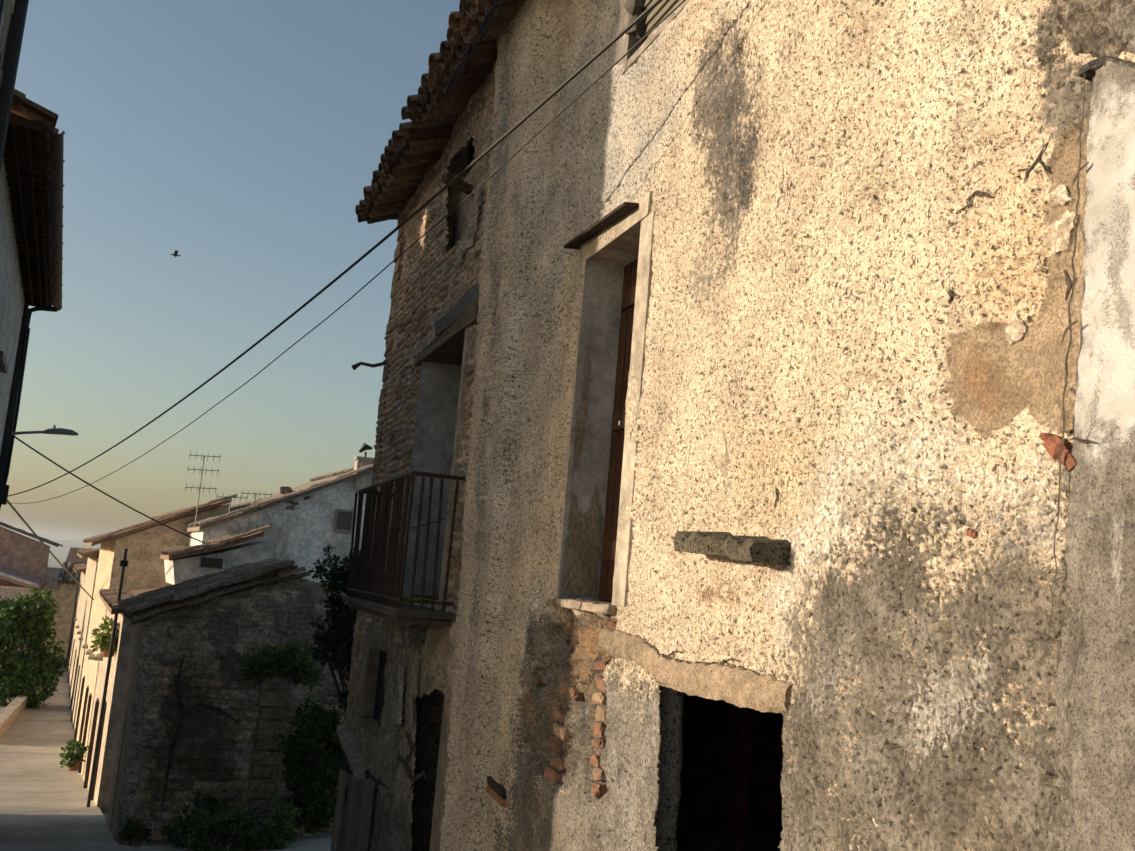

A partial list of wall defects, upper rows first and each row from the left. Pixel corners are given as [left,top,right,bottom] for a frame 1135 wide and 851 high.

leakage [687,20,760,303]
flaking render [944,116,1100,491]
peeling [1103,172,1135,333]
flaking render [520,604,617,799]
crack [559,598,760,702]